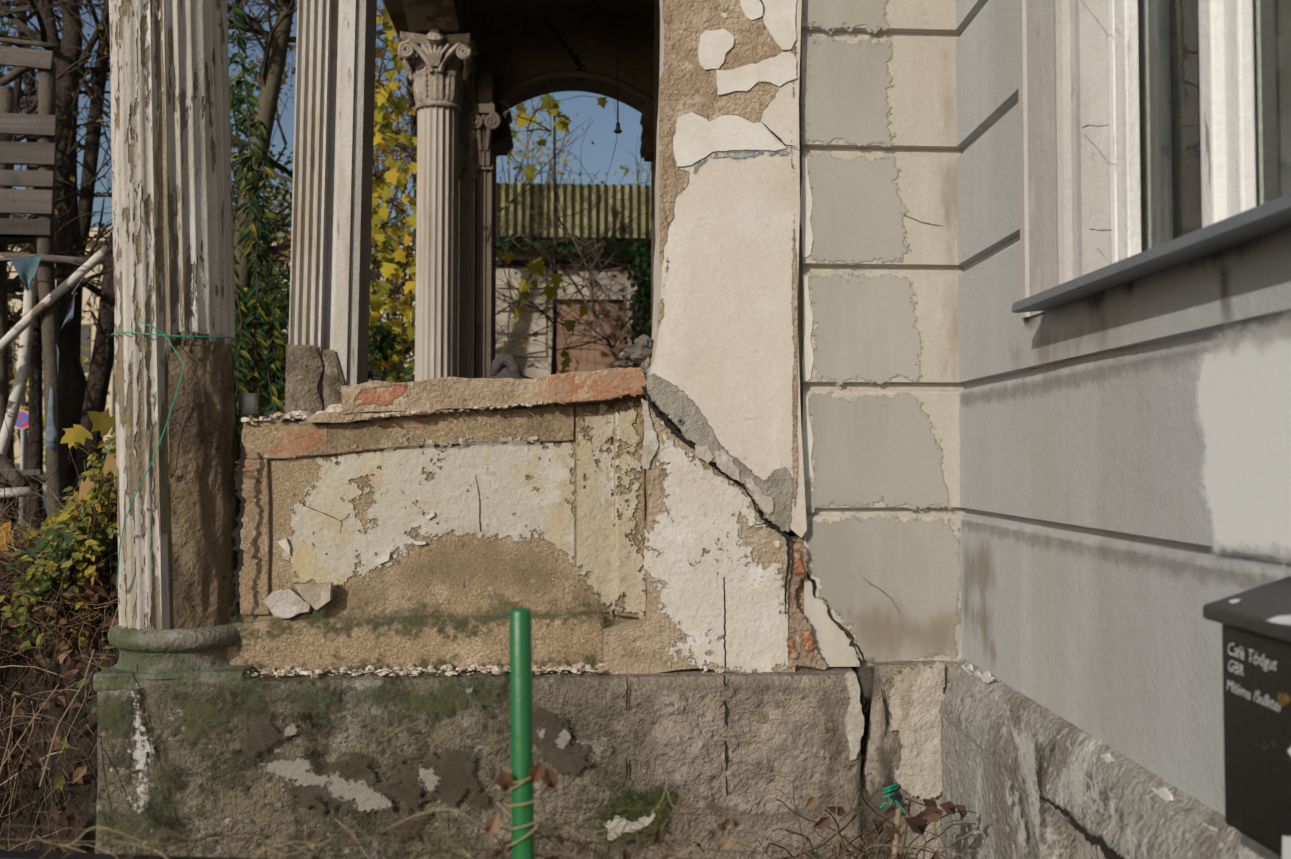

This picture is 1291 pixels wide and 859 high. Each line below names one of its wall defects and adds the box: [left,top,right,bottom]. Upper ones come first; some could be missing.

peeling [109,0,828,673]
crack [641,386,888,859]
spalling [283,721,299,737]
spalling [533,722,571,750]
peeling [844,661,945,806]
spalling [259,756,392,813]
spalling [417,764,442,796]